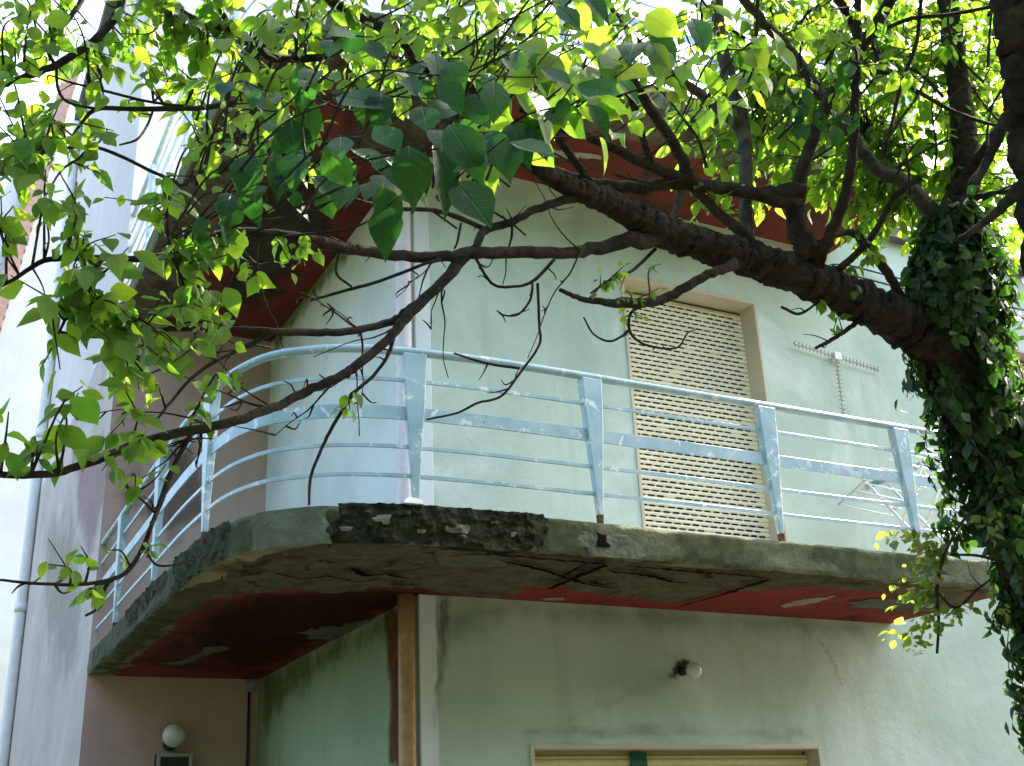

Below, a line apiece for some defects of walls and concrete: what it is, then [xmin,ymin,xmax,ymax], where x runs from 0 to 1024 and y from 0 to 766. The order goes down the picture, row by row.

crack [275,568,407,583]
spalling [111,497,904,665]
crack [453,554,771,606]